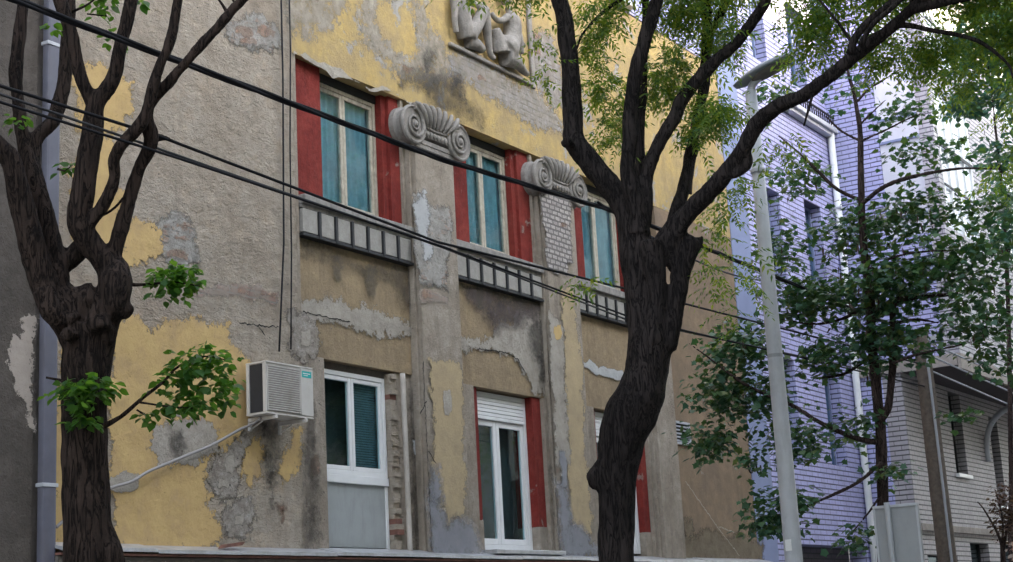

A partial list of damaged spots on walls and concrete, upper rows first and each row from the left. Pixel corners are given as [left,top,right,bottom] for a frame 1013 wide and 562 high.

flaking render [224,0,563,134]
flaking render [412,192,453,293]
flaking render [5,313,40,434]
peeling [107,313,266,555]
peeling [276,426,305,485]
flaking render [286,295,412,364]
peeling [427,190,594,536]